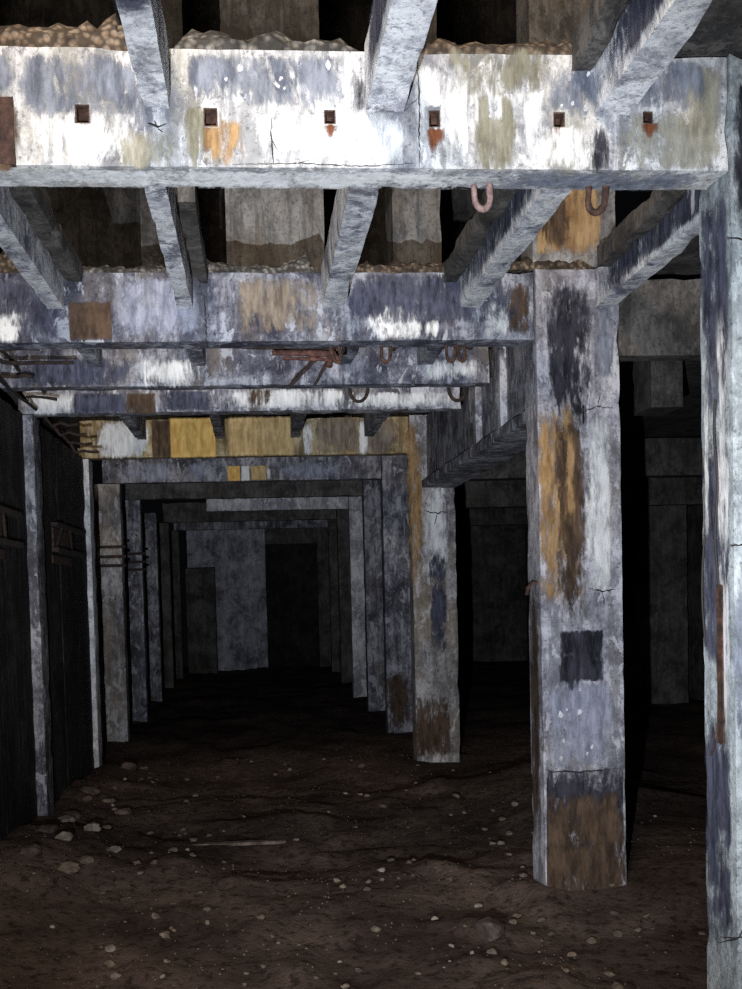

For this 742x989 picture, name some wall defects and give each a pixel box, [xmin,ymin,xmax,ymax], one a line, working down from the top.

rust [428,128,444,150]
rust [643,123,657,136]
rust [537,189,602,253]
rust [238,347,343,387]
water stain [547,288,611,591]
water stain [546,770,626,891]